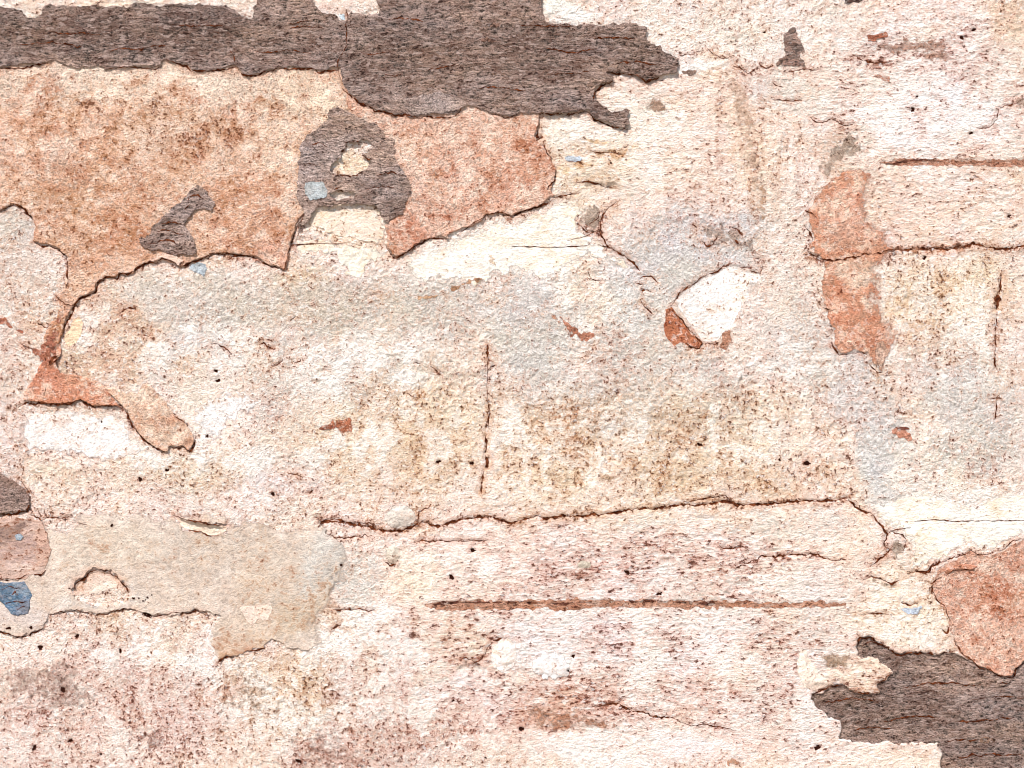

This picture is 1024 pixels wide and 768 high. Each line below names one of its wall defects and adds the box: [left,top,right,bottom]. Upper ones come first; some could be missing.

flaking render [0,0,679,461]
flaking render [664,266,762,348]
flaking render [809,169,896,371]
crack [0,569,205,638]
flaking render [0,474,349,659]
crack [217,648,265,664]
crack [288,345,1024,695]
spalling [811,493,1024,768]